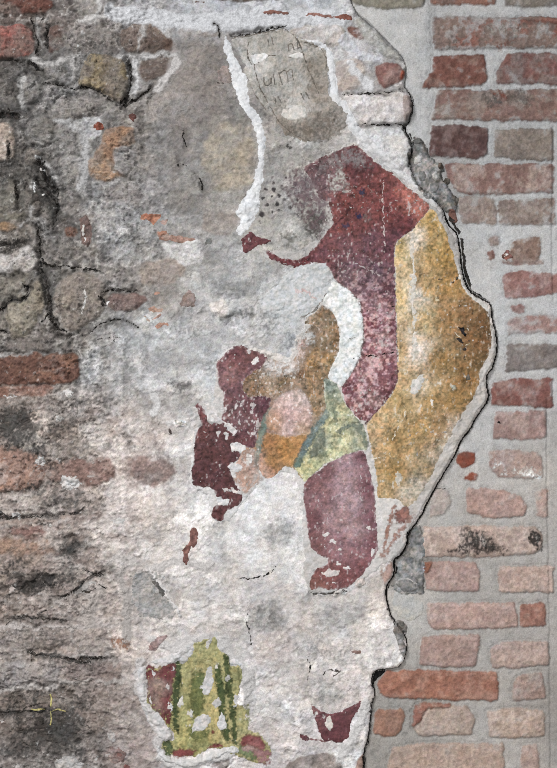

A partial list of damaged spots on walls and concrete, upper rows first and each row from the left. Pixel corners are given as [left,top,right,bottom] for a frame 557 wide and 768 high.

flaking render [66,215,92,247]
spalling [140,213,195,243]
crack [42,261,104,273]
peeling [408,233,418,361]
crack [88,318,139,340]
peeling [410,374,425,395]
crack [362,209,498,768]
peeling [130,567,182,620]
spalling [105,742,136,768]